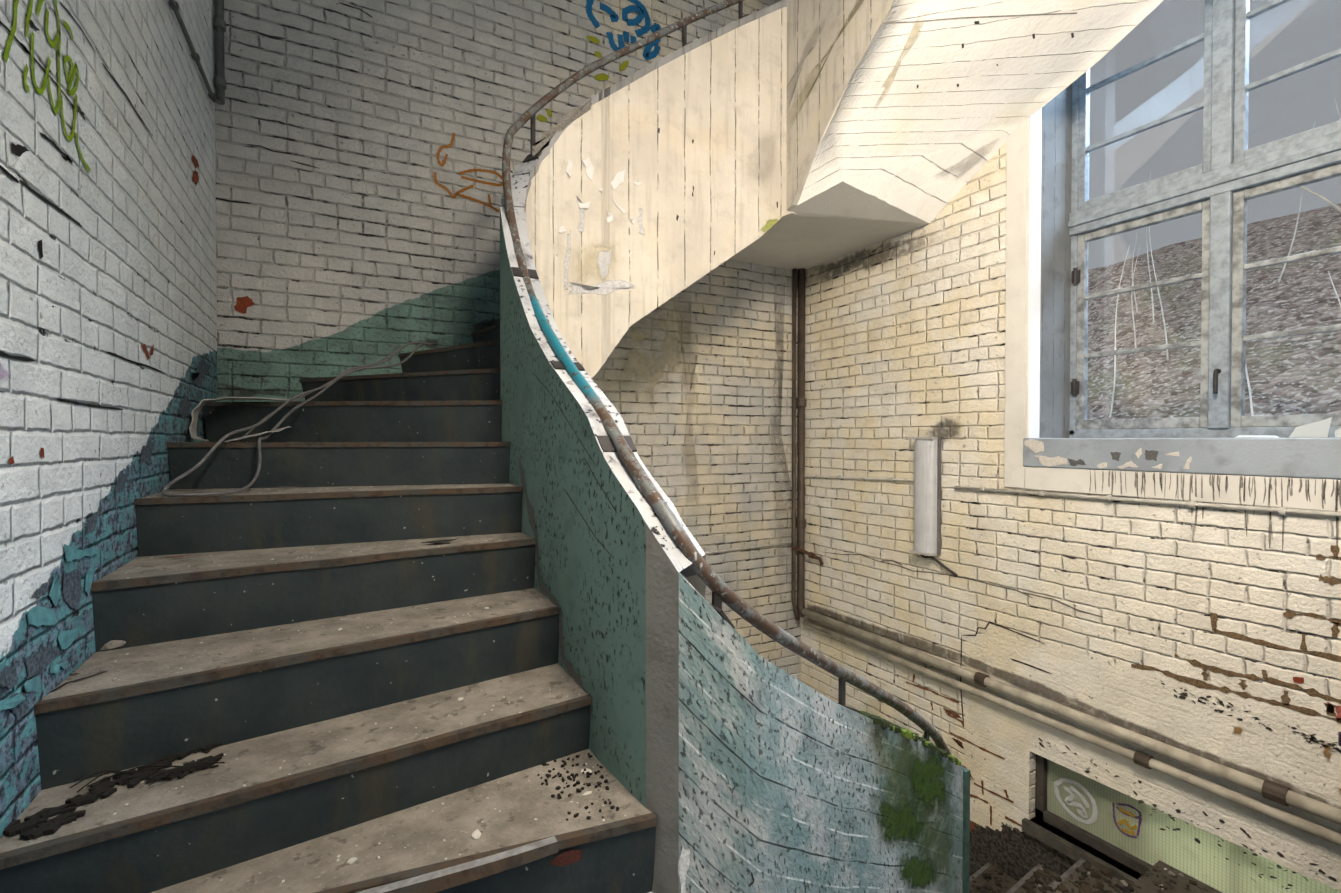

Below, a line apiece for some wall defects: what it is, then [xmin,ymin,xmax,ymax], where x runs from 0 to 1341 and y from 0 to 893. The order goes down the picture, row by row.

peeling [555,157,645,295]
peeling [177,358,210,418]
peeling [114,438,155,494]
peeling [1024,439,1192,469]
leakage [1090,470,1341,554]
spalling [1315,545,1341,585]
peeling [0,509,101,724]
spalling [1210,610,1341,662]
spalling [1131,653,1341,753]